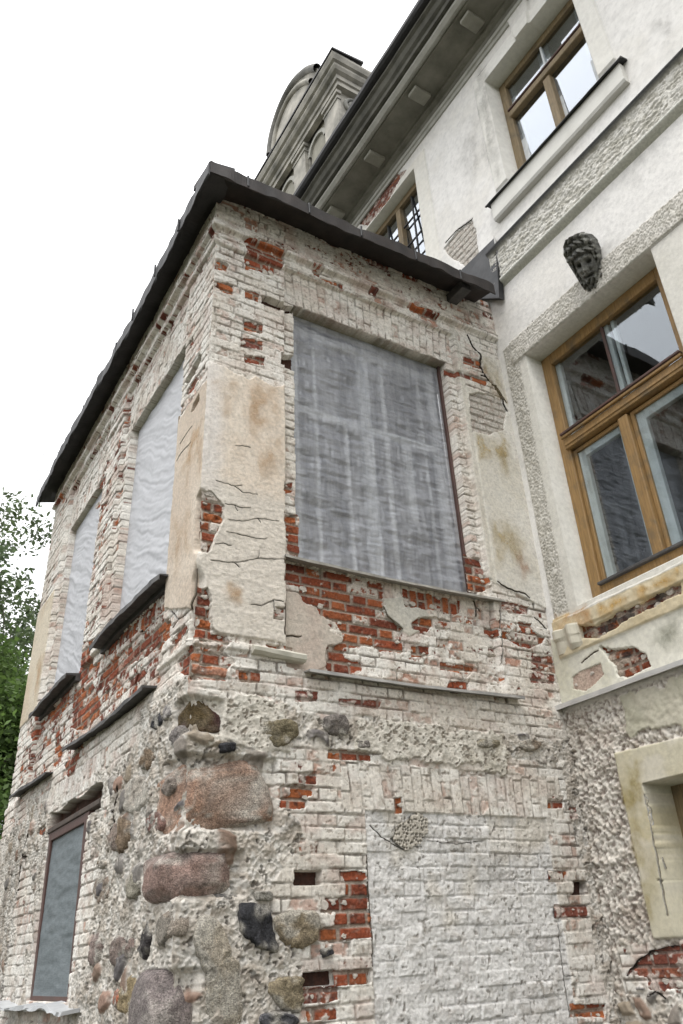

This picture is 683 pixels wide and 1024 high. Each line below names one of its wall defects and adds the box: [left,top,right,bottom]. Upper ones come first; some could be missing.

spalling [244,238,287,276]
peeling [445,221,479,266]
crack [467,334,508,412]
spalling [199,491,224,553]
crack [171,480,277,628]
spalling [284,514,460,675]
spalling [463,554,494,593]
flaking render [440,663,473,694]
spalling [484,602,555,684]
spalling [573,586,682,691]
crack [366,825,476,967]
spalling [627,944,683,992]